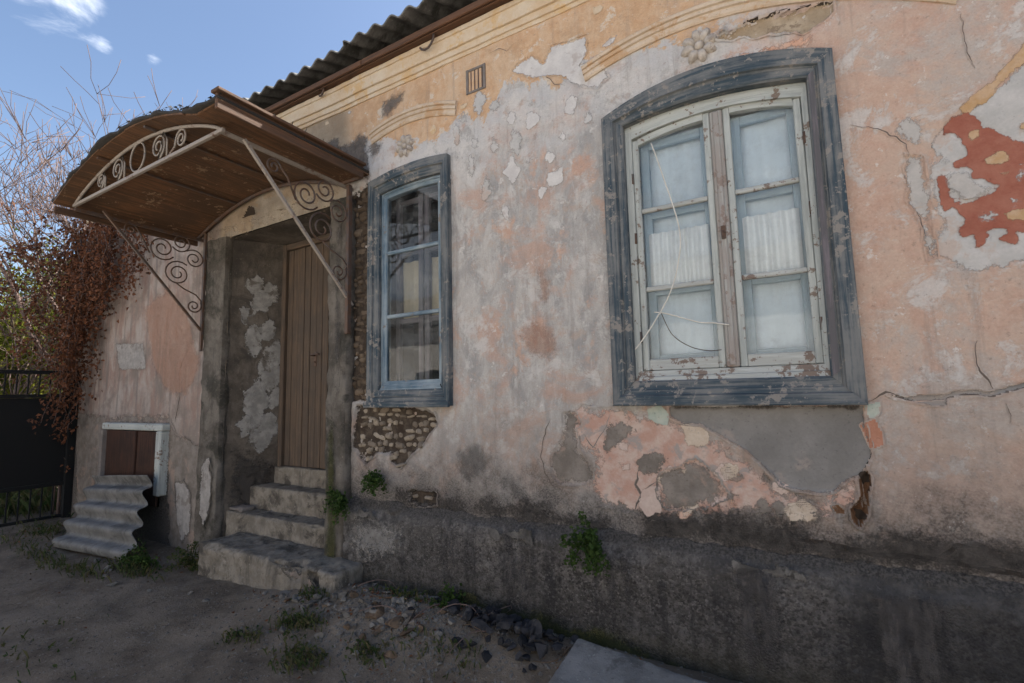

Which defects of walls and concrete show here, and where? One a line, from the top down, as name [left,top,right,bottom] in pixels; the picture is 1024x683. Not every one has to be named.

peeling [510,33,611,124]
crack [852,125,909,155]
peeling [895,44,1024,271]
crack [908,203,940,262]
peeling [233,275,281,456]
flaking render [351,184,438,470]
crack [868,340,1023,422]
leakage [350,518,401,557]
leakage [391,487,611,530]
peeling [549,404,875,531]
leakage [637,506,1024,581]
leakage [877,597,945,683]